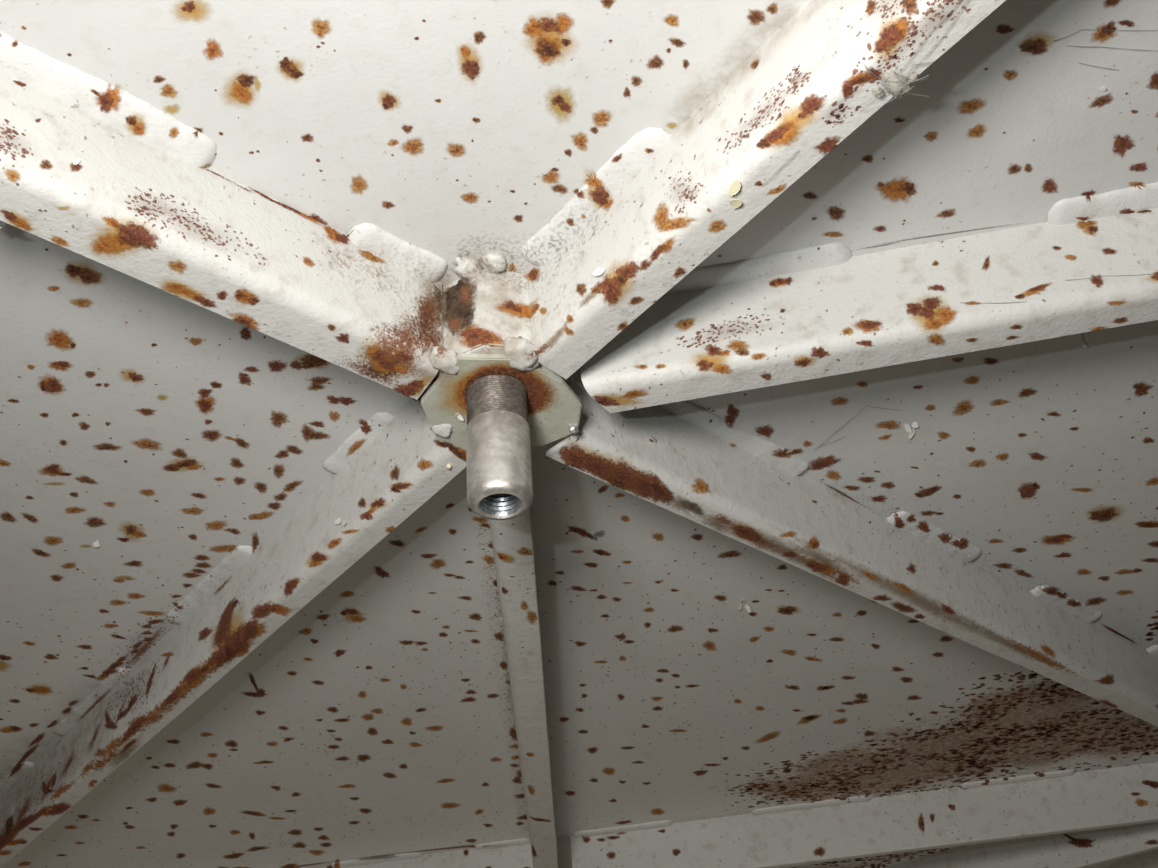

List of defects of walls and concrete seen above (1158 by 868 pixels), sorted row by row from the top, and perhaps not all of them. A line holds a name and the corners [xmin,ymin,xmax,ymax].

rust [523,15,572,62]
rust [875,0,917,55]
rust [1020,36,1050,54]
rust [756,94,826,149]
rust [94,217,157,254]
rust [576,205,693,305]
rust [344,269,503,403]
rust [499,301,546,318]
rust [906,285,956,345]
rust [447,364,553,414]
rust [0,355,355,868]
rust [538,441,1158,812]